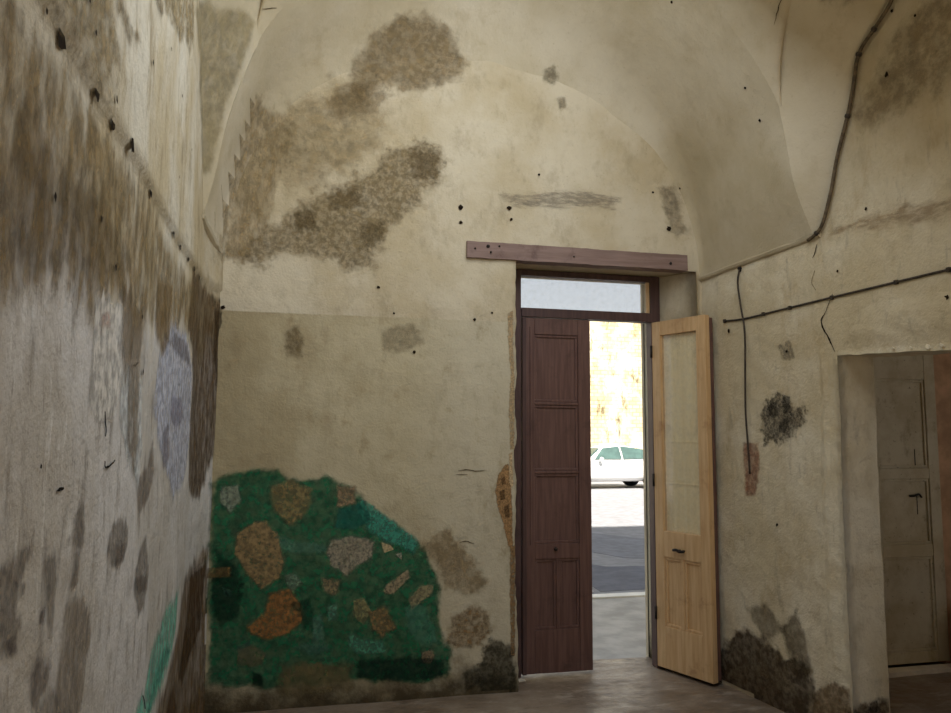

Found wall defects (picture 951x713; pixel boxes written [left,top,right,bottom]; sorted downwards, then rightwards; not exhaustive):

mould [356,18,462,95]
leakage [221,99,440,267]
leakage [0,0,222,496]
mould [760,392,806,445]
leakage [448,609,517,693]
leakage [718,618,889,713]